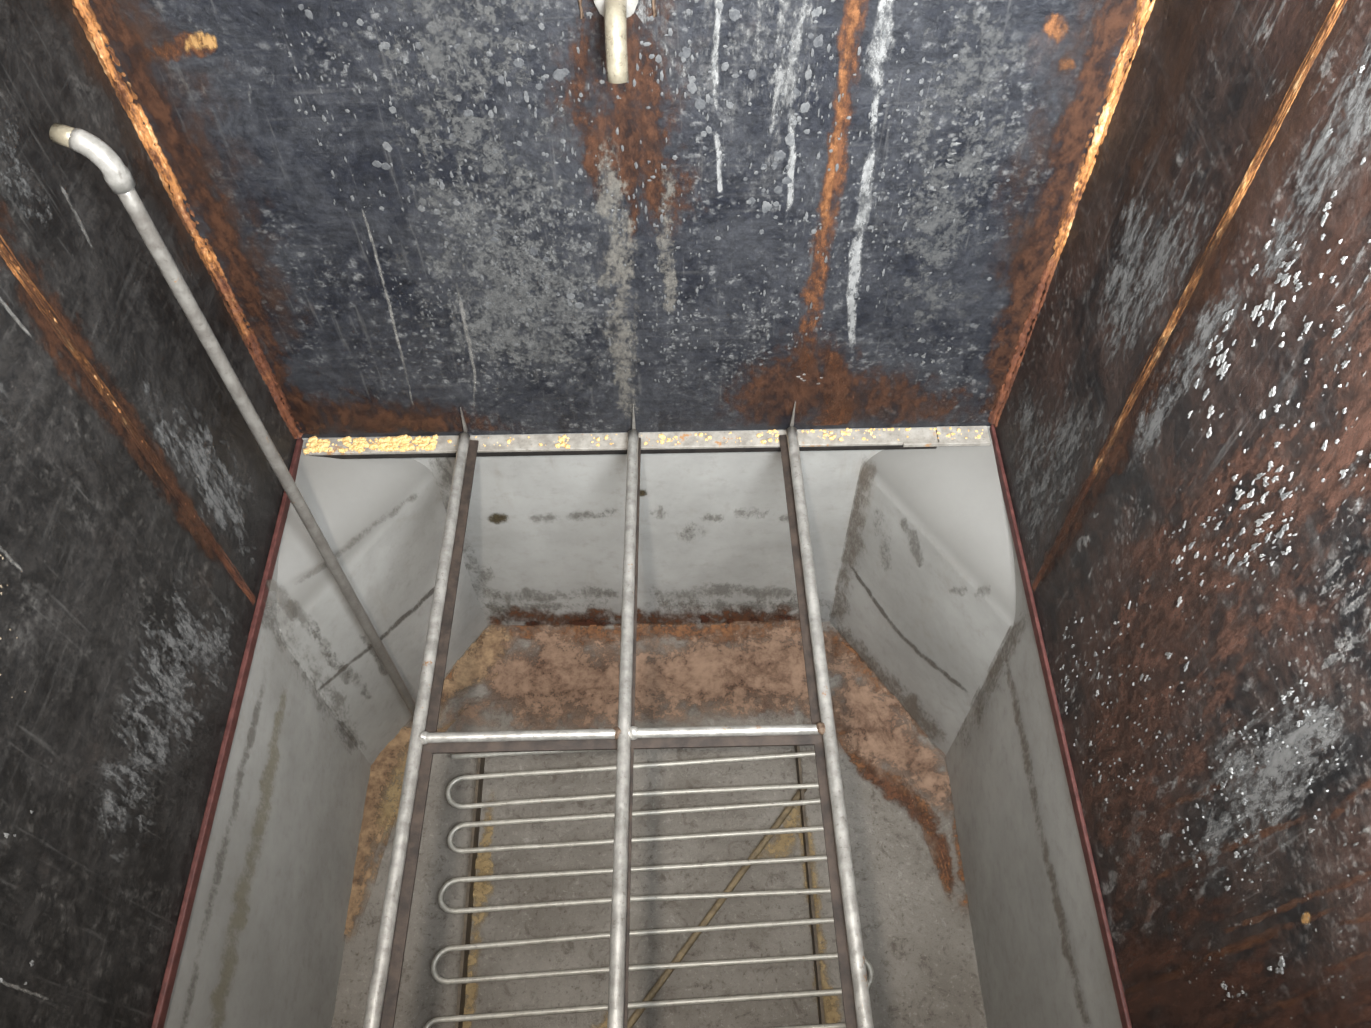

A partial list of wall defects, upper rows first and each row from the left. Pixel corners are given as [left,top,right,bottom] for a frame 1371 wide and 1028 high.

corrosion [564,0,691,235]
water stain [712,0,722,107]
water stain [786,115,796,211]
water stain [789,0,806,98]
corrosion [726,0,965,425]
water stain [847,153,875,343]
water stain [869,0,894,126]
corrosion [986,0,1139,409]
corrosion [0,202,222,562]
water stain [489,514,508,524]
corrosion [491,606,800,627]
corrosion [1082,283,1371,1028]